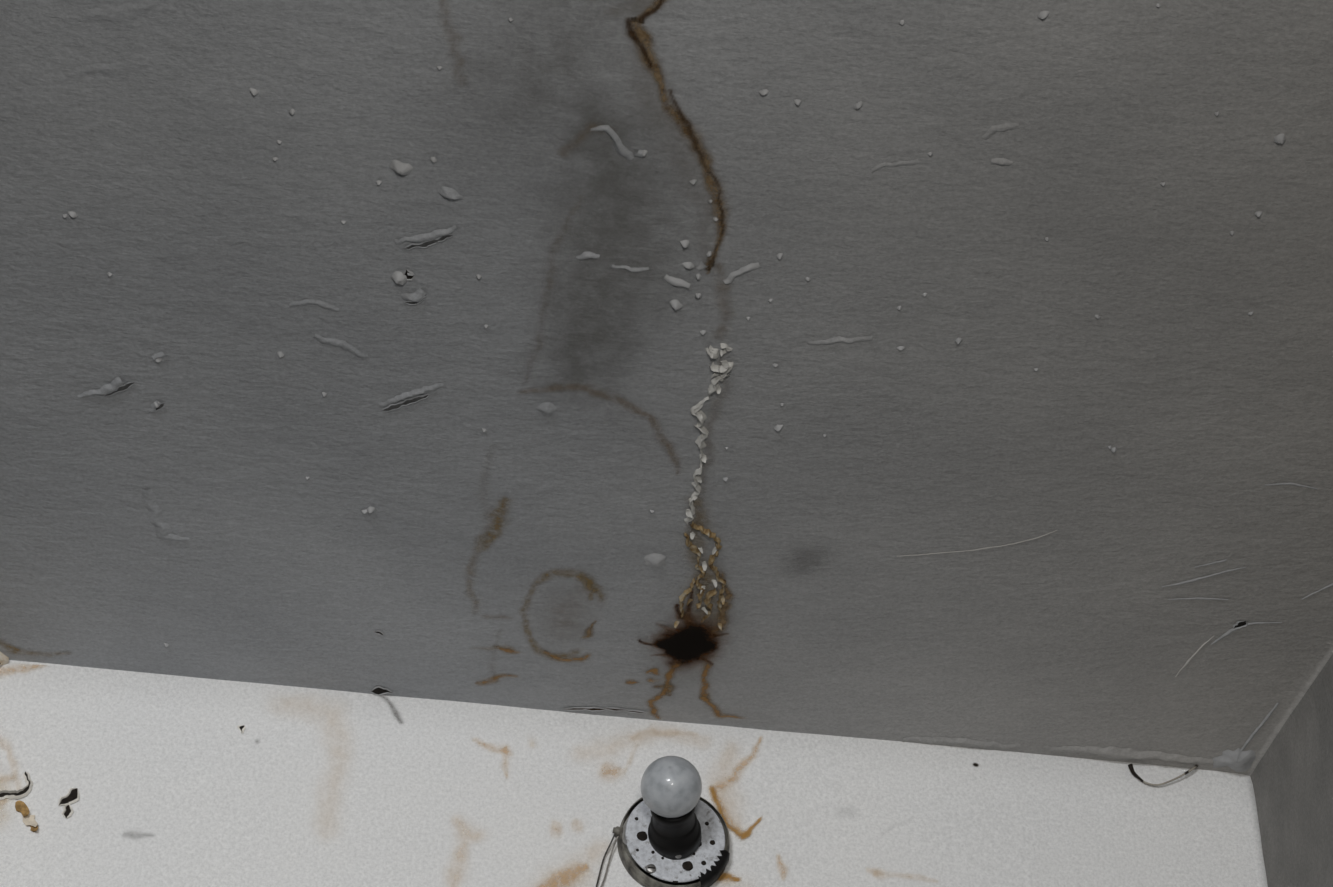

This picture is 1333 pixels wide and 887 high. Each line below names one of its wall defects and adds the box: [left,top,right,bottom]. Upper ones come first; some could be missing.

corrosion [626,574,739,718]
peeling [15,800,38,832]
corrosion [709,757,761,839]
corrosion [717,873,740,881]